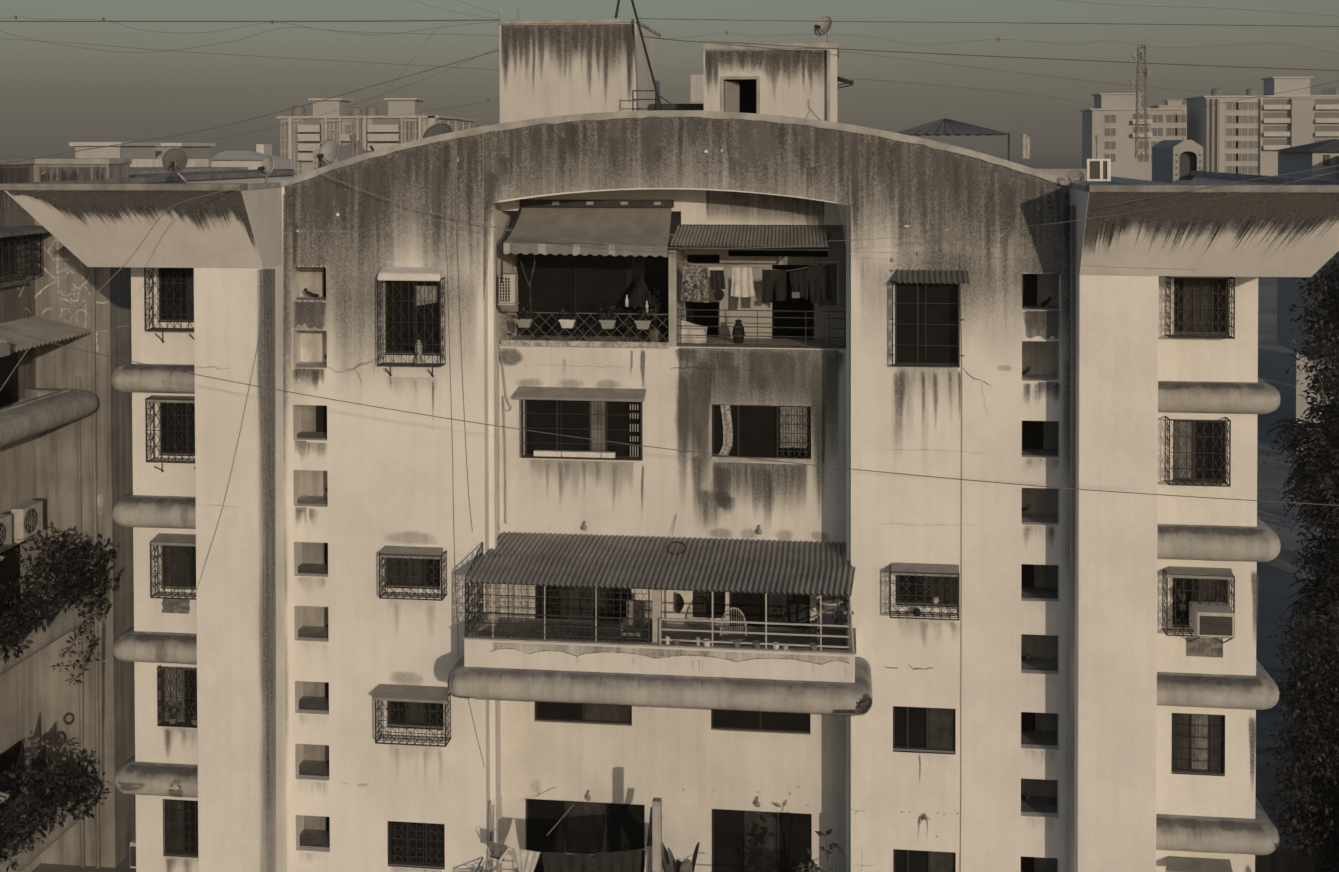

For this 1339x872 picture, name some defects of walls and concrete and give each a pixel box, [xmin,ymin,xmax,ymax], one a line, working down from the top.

damp [501,24,635,87]
damp [705,49,828,82]
damp [1094,215,1339,248]
damp [258,117,1075,849]